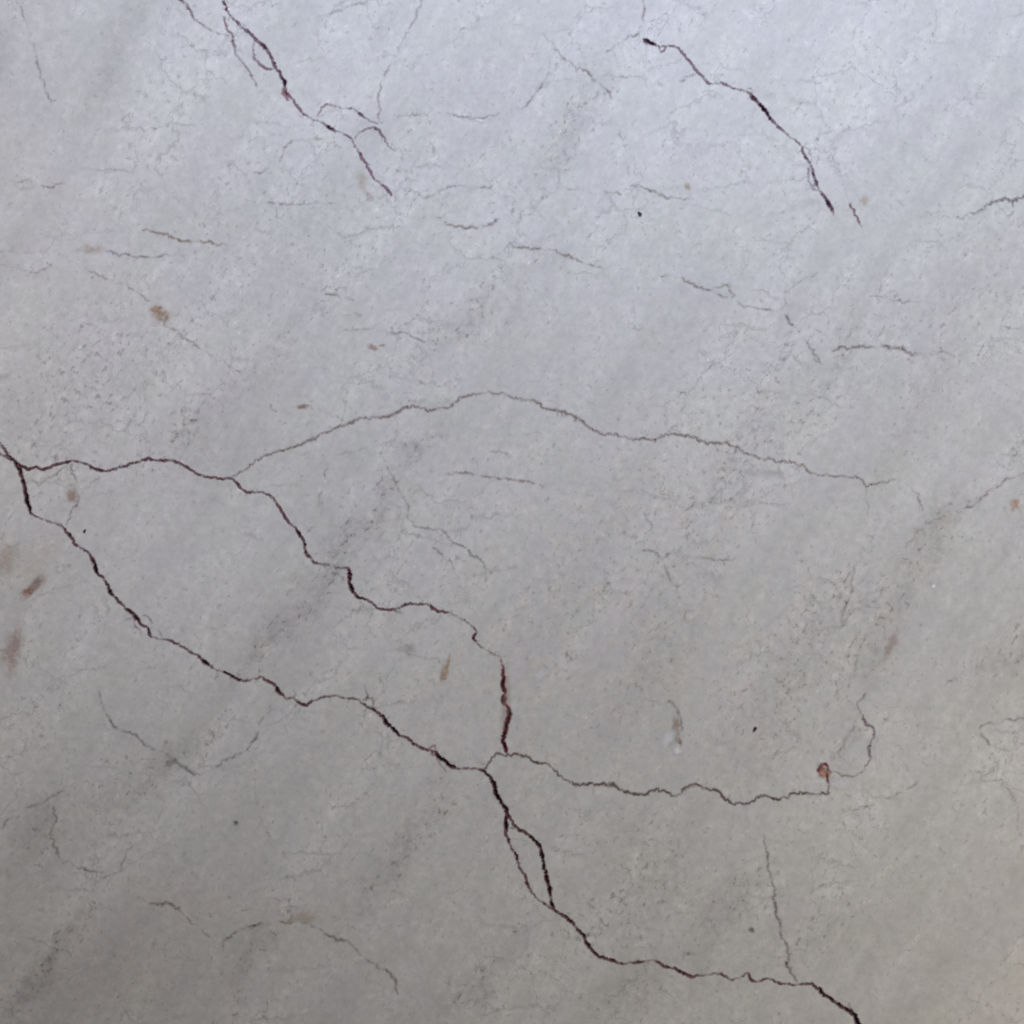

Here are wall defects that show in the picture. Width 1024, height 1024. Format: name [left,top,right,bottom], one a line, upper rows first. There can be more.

crack [223,3,392,196]
crack [643,38,860,223]
crack [382,395,472,418]
crack [0,420,861,1024]